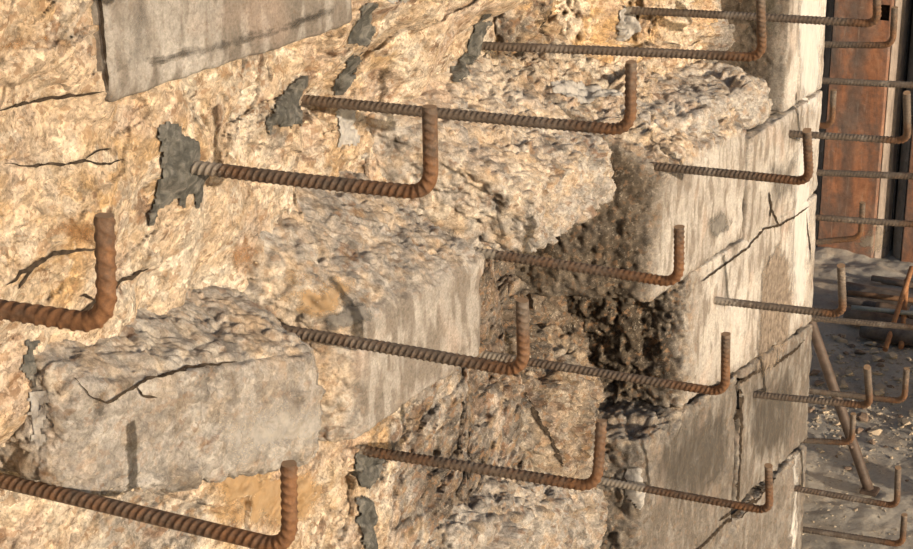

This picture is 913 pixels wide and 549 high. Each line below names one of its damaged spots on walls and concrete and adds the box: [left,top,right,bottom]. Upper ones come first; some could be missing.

crack [0,0,109,111]
spalling [190,0,913,199]
crack [5,148,123,168]
crack [7,248,95,289]
spalling [0,212,118,333]
crack [703,192,811,281]
crack [75,361,236,404]
spalling [281,297,731,395]
spalling [0,460,299,549]
corrosion [216,475,282,526]
corrosion [297,475,322,519]
spalling [355,419,774,513]